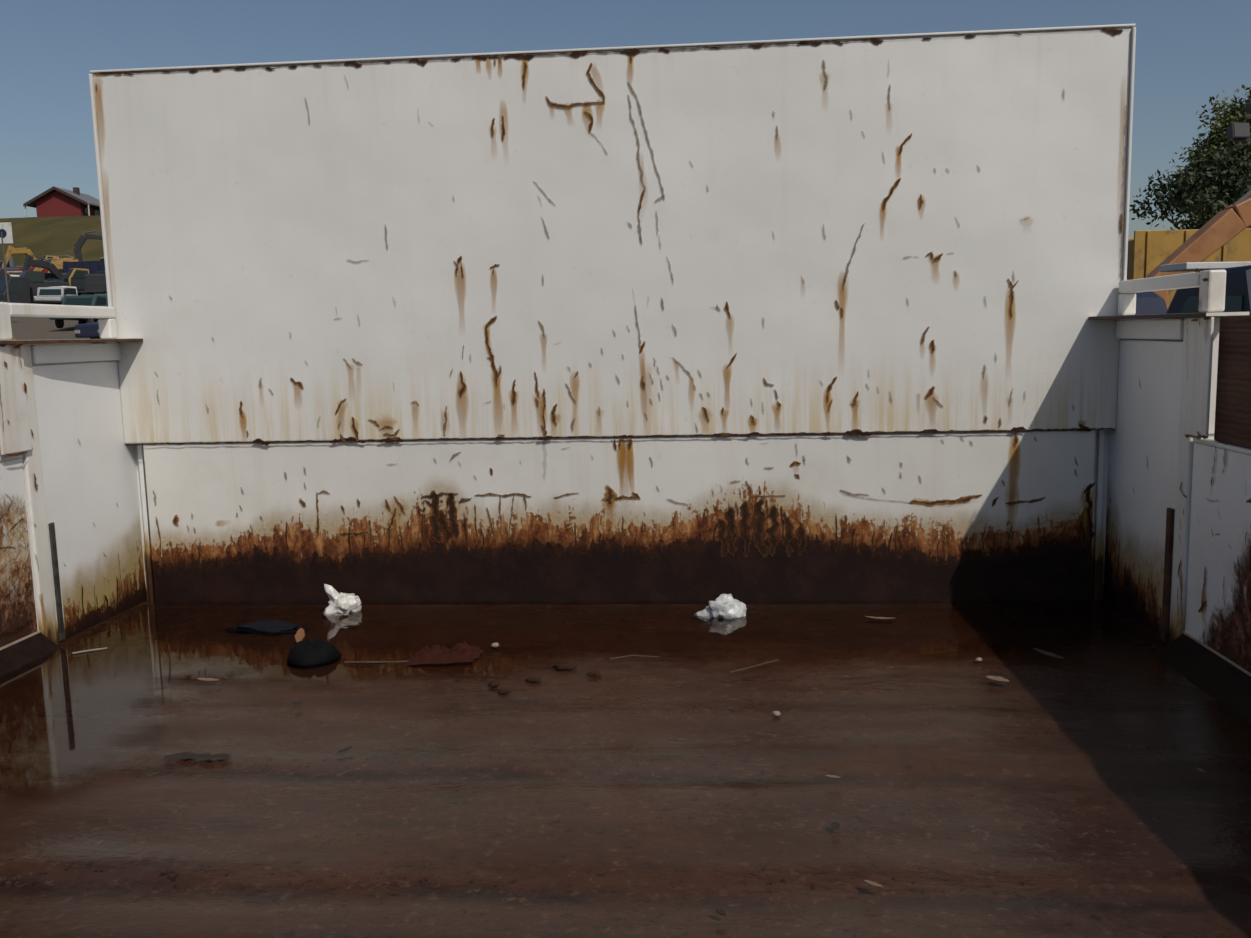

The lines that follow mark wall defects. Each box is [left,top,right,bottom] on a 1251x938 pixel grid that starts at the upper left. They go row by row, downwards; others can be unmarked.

corrosion [491,116,505,141]
corrosion [881,133,912,217]
corrosion [835,275,846,318]
corrosion [485,316,502,402]
corrosion [724,353,737,386]
corrosion [330,399,402,443]
corrosion [534,372,557,441]
corrosion [613,435,633,474]
corrosion [824,377,837,414]
corrosion [822,429,872,437]
corrosion [1010,427,1027,487]
corrosion [62,481,1183,638]